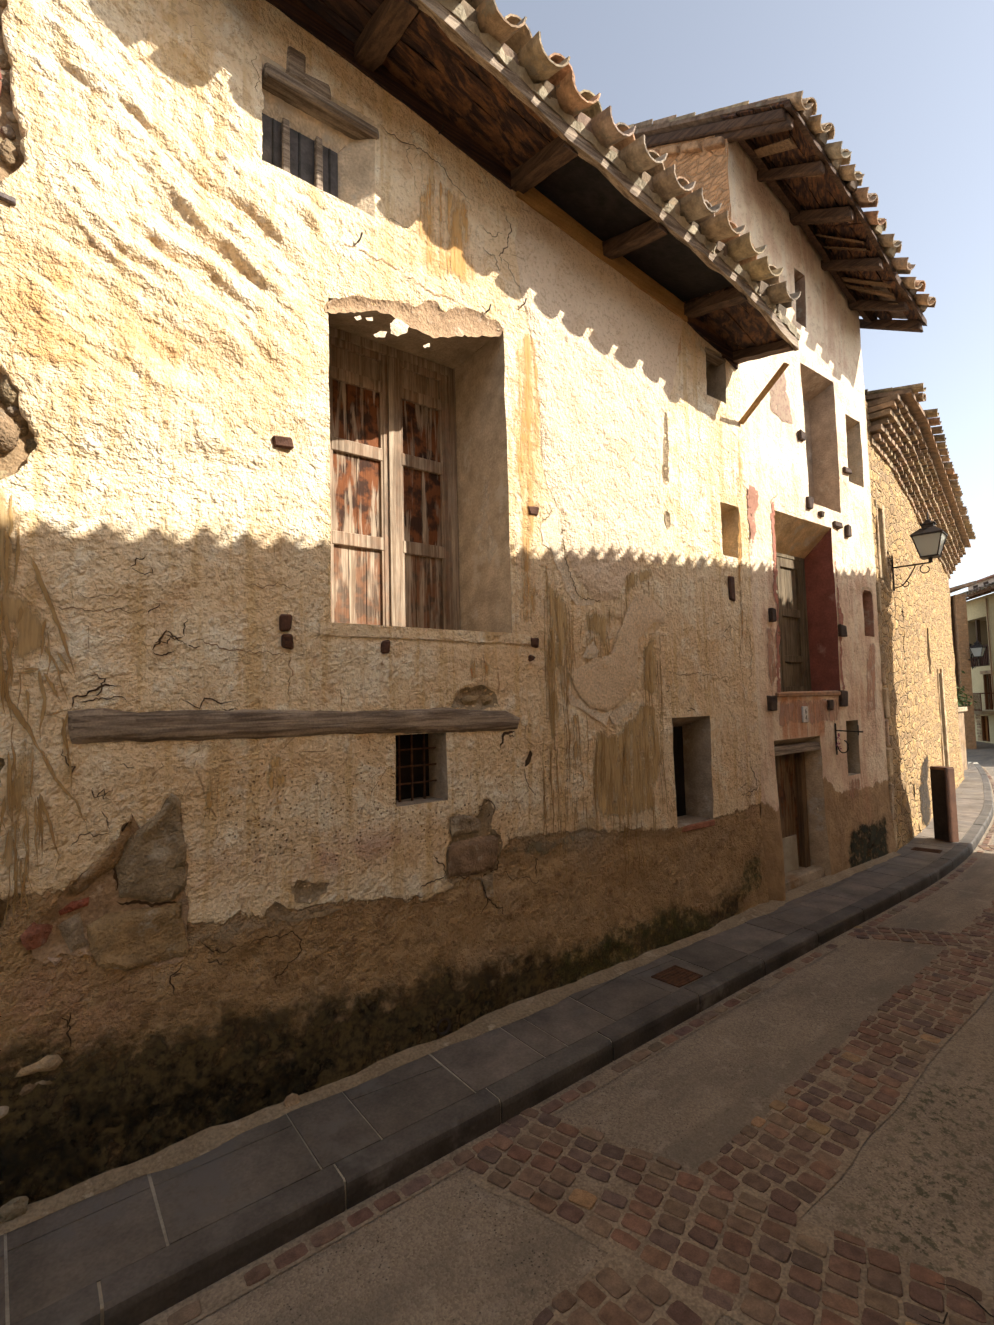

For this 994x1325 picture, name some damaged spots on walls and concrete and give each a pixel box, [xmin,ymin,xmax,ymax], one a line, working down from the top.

flaking render [0,0,24,206]
flaking render [325,295,504,348]
flaking render [0,372,38,480]
damp [0,494,87,932]
crack [70,674,130,710]
crack [55,554,293,697]
crack [183,698,240,711]
damp [513,335,669,885]
flaking render [20,793,190,971]
flaking render [265,879,341,922]
flaking render [446,799,503,898]
damp [0,857,762,1207]